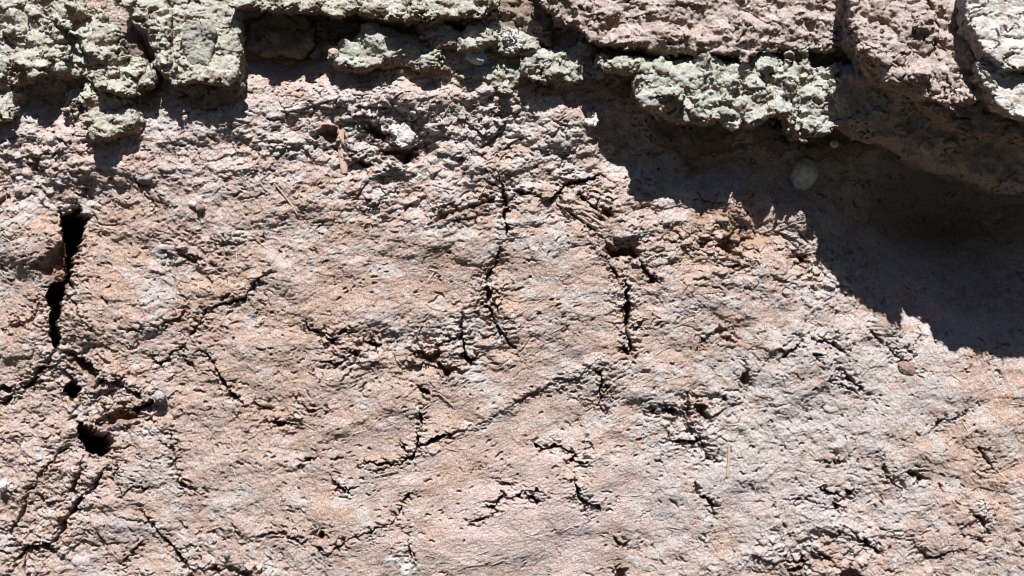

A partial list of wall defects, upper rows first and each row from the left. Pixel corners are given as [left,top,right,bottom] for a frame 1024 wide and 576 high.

crack [0,257,97,404]
crack [305,323,379,366]
crack [362,255,661,472]
crack [421,174,603,363]
crack [0,448,197,576]
crack [331,492,412,558]
crack [472,478,540,522]
crack [535,441,600,510]